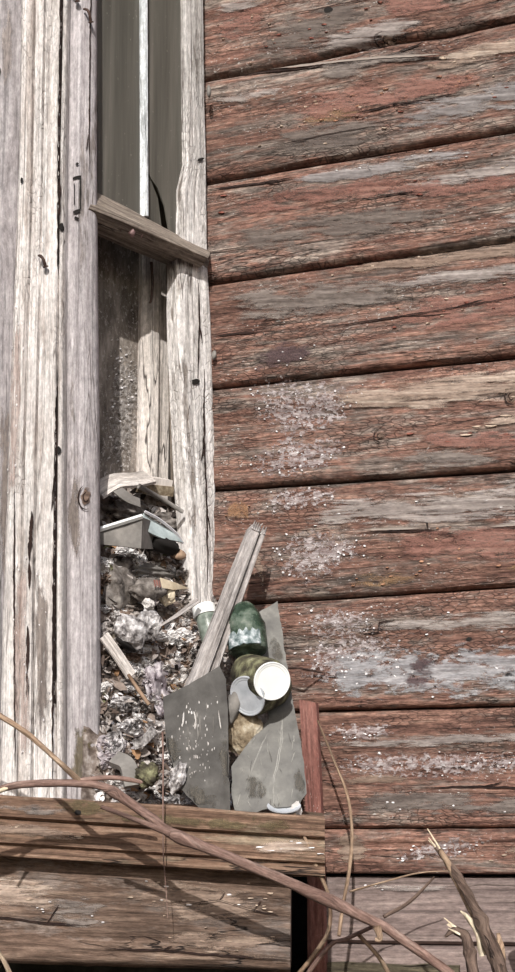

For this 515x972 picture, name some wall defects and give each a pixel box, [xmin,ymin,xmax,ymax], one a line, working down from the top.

peeling [261,0,451,78]
peeling [396,39,515,127]
peeling [298,150,515,196]
damp [249,342,363,478]
damp [266,485,343,513]
damp [272,531,366,584]
damp [294,606,439,687]
damp [329,724,393,740]
damp [348,751,515,777]